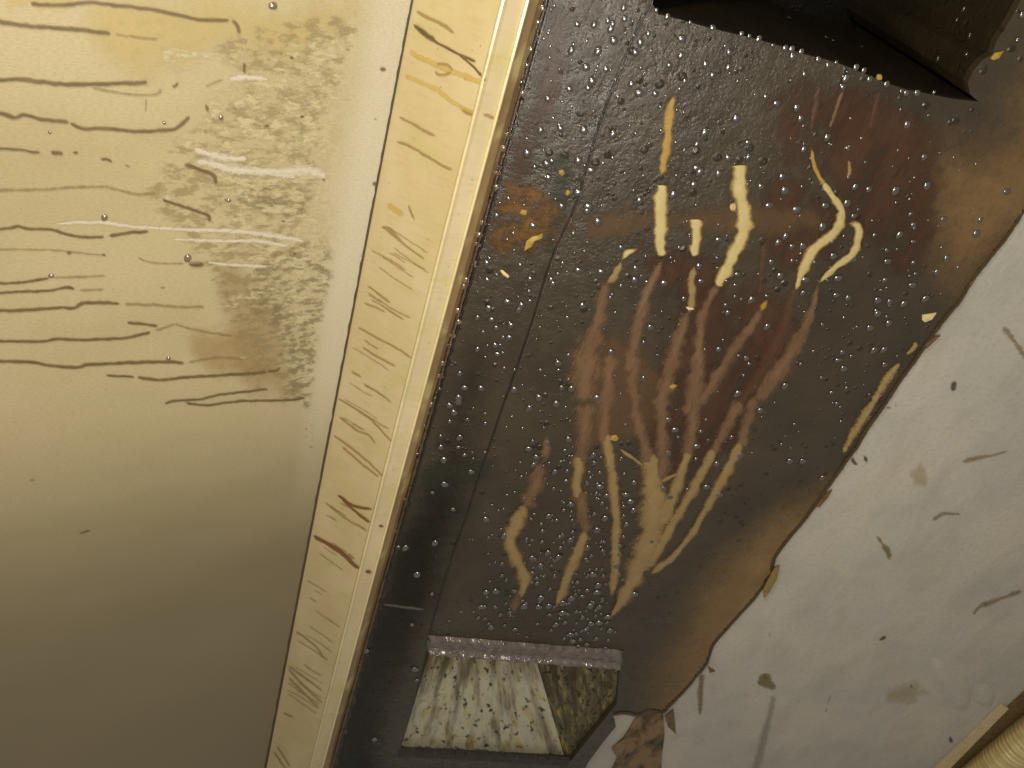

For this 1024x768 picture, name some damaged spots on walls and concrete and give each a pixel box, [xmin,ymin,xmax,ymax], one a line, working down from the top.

crack [0,1,240,40]
crack [0,63,246,162]
water stain [406,12,499,122]
rust [767,179,804,214]
rust [778,88,1024,282]
crack [0,225,304,407]
rust [576,203,833,469]
water stain [556,97,863,617]
peeling [843,364,900,452]
peeling [907,335,941,354]
water stain [503,437,550,611]
peeling [665,709,676,734]